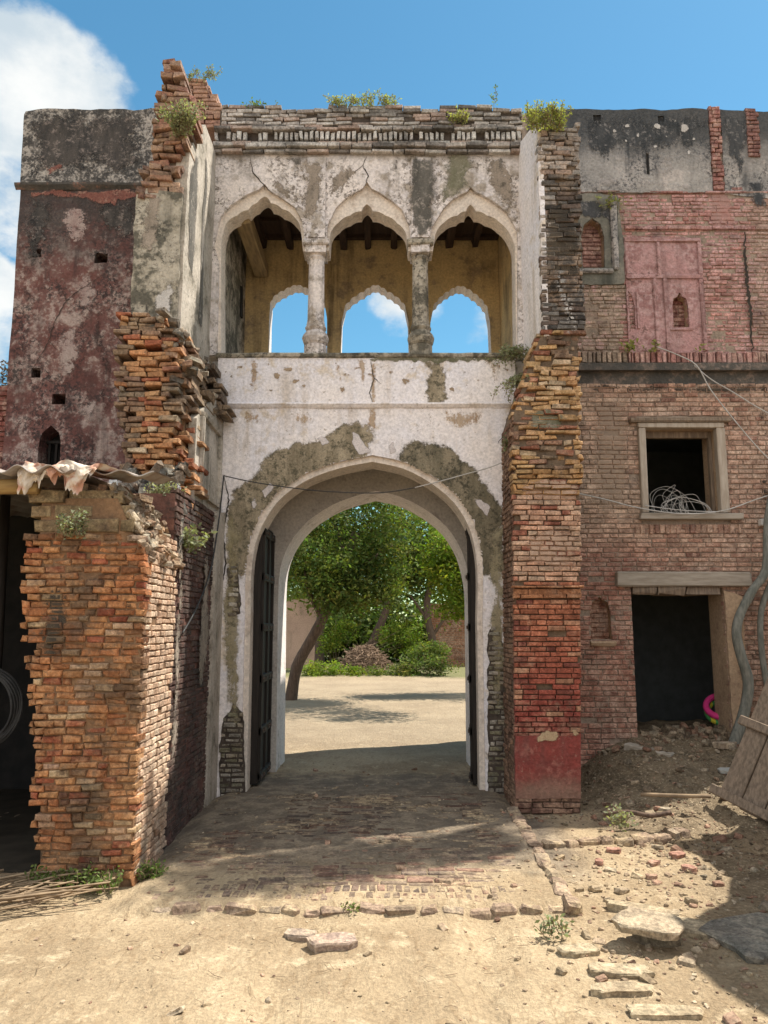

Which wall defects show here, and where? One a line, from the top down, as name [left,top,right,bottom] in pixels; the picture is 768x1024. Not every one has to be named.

leakage [29,111,142,172]
flaking render [31,189,136,242]
leakage [410,157,437,235]
peeling [78,275,96,306]
crack [743,232,754,352]
peeling [58,328,79,373]
flaking render [226,421,374,616]
flaking render [389,440,504,576]
spalling [219,704,245,796]
peeling [537,731,558,742]